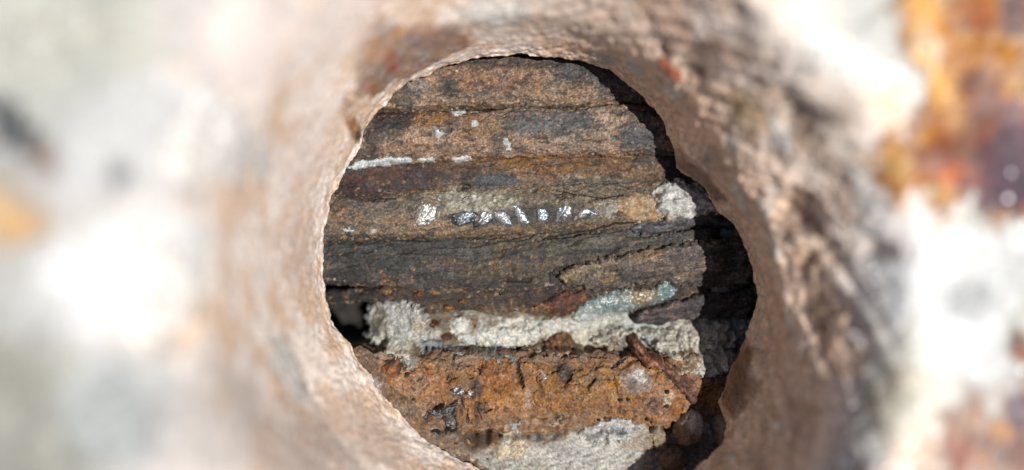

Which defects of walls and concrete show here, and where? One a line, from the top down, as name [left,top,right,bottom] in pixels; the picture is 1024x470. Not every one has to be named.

leakage [568,281,678,323]
rust [381,357,404,376]
spalling [424,400,459,436]
spalling [471,382,483,414]
rust [480,359,520,397]
rust [457,378,593,448]
rust [612,358,698,415]